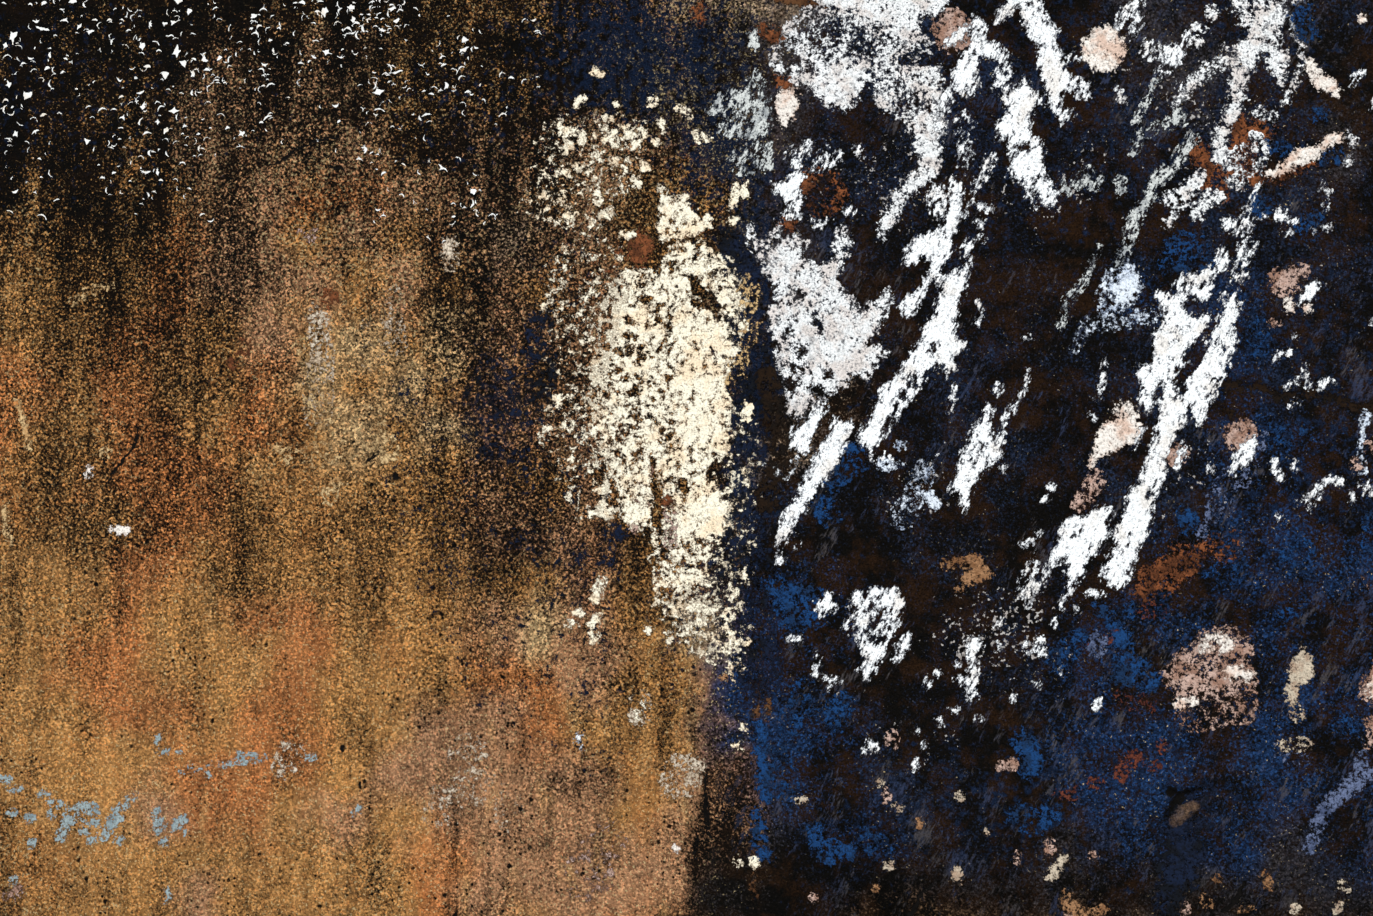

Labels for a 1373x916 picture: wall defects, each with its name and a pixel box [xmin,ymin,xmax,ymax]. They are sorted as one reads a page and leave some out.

water stain [440,236,460,272]
rust [593,226,655,277]
water stain [302,301,335,429]
rust [316,286,341,310]
water stain [360,284,408,367]
rust [627,465,678,550]